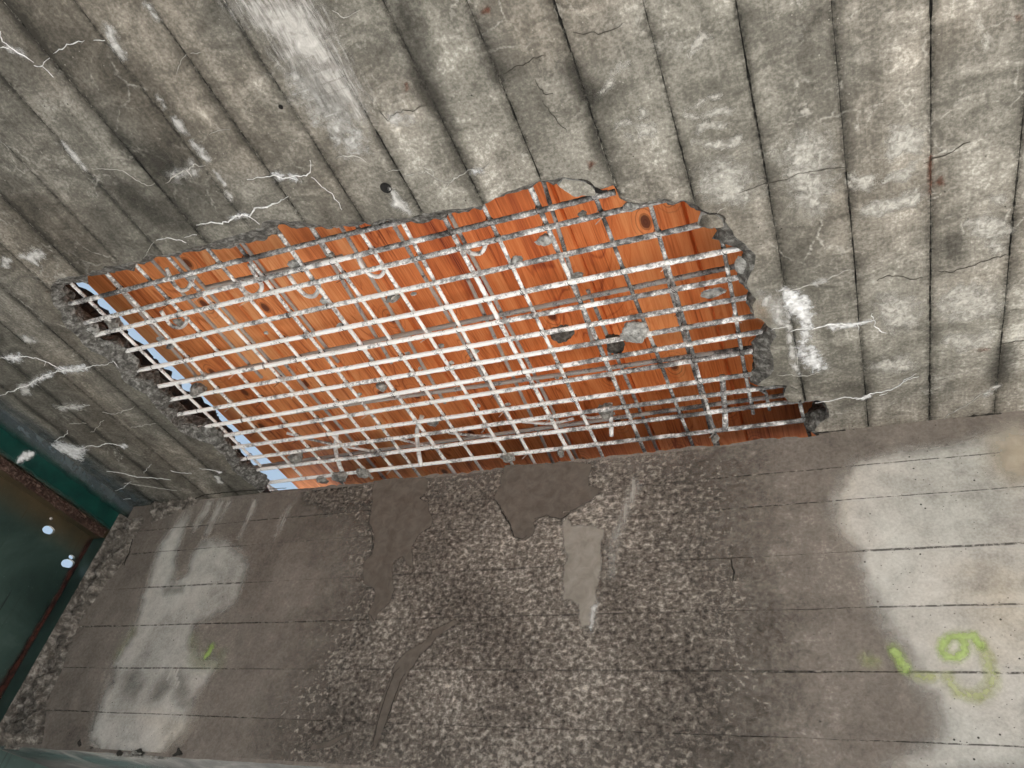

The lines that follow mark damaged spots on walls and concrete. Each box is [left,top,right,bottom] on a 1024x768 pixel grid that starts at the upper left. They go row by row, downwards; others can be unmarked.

crack [0,31,105,77]
peeling [701,161,748,202]
crack [145,161,342,256]
damp [758,288,827,374]
crack [772,314,885,333]
crack [0,353,118,396]
crack [818,374,919,403]
crack [51,404,284,500]
spalling [51,177,829,768]